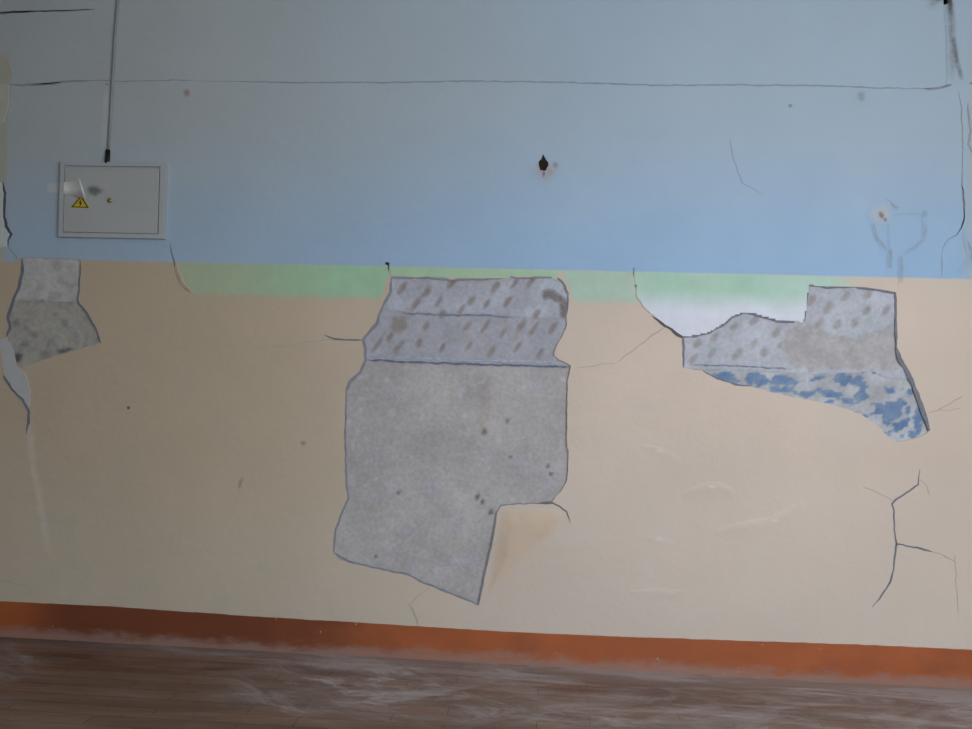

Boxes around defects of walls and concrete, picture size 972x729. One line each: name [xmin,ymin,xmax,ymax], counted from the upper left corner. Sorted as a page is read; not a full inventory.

crack [9,79,972,274]
flaking render [0,182,101,557]
flaking render [170,245,572,605]
flaking render [633,267,930,442]
crack [863,470,959,617]